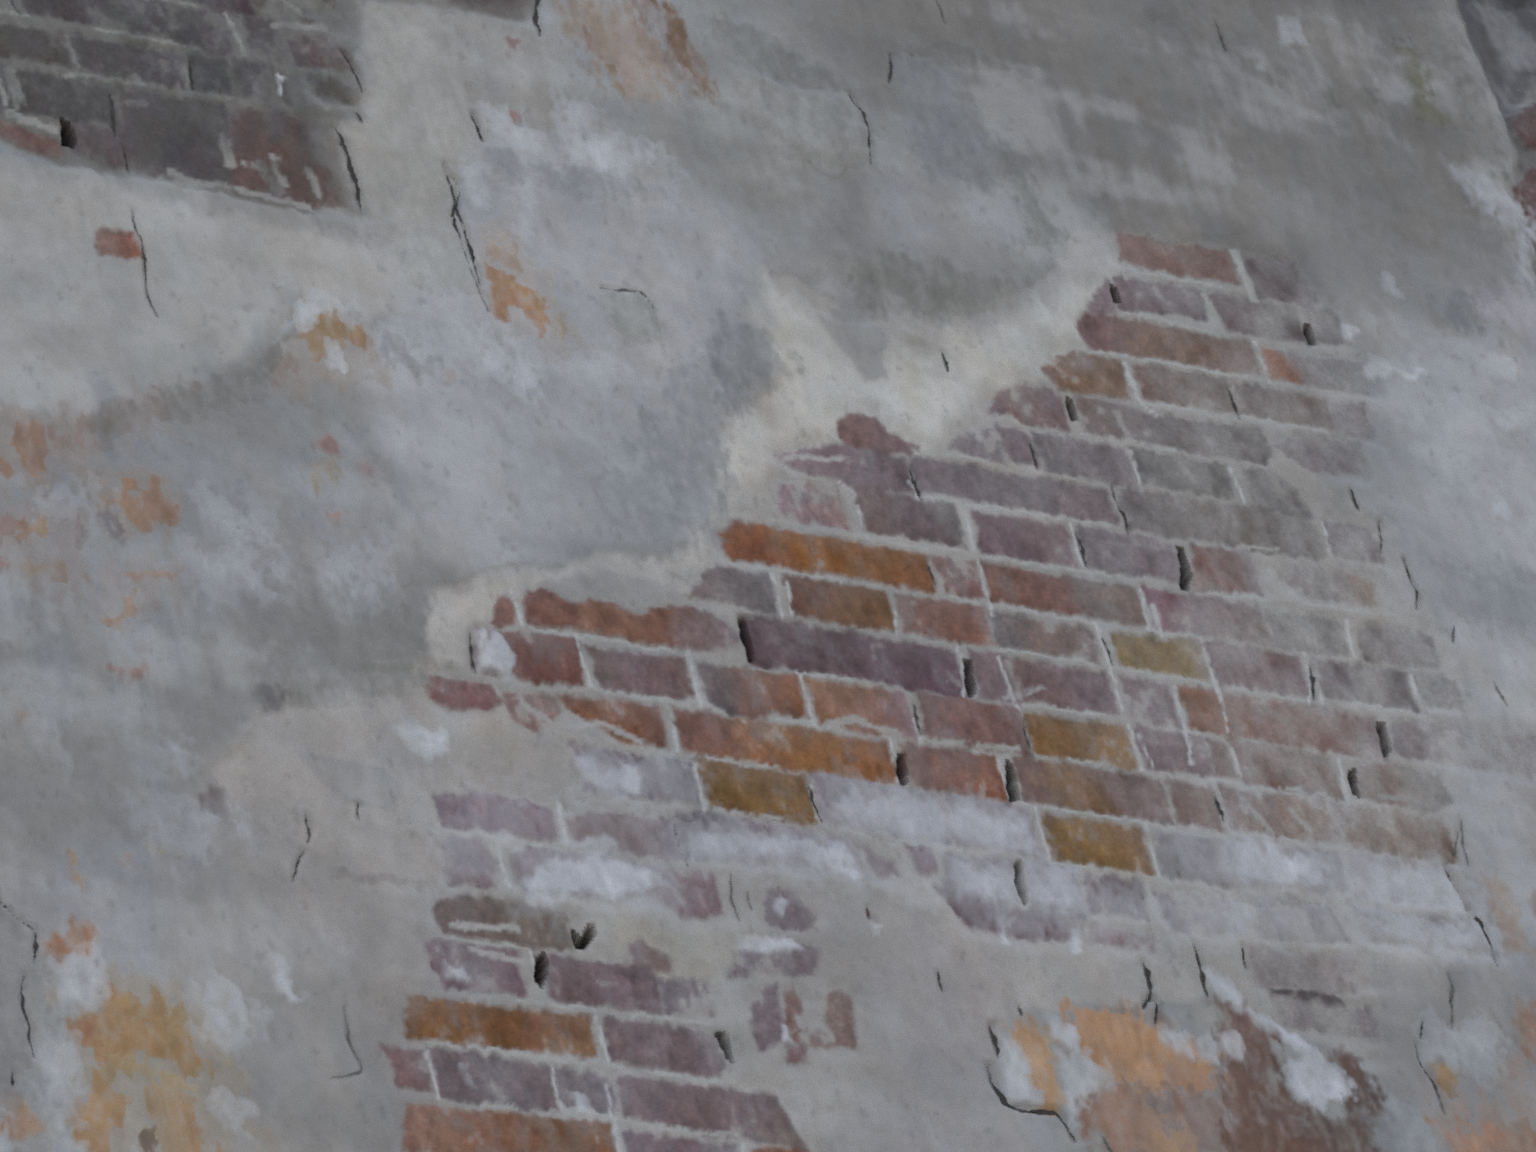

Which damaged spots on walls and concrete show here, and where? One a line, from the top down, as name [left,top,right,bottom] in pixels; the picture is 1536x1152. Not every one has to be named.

flaking render [0,0,585,363]
crack [443,167,489,311]
flaking render [1505,101,1536,214]
flaking render [208,225,1536,1152]
crack [0,902,39,1088]